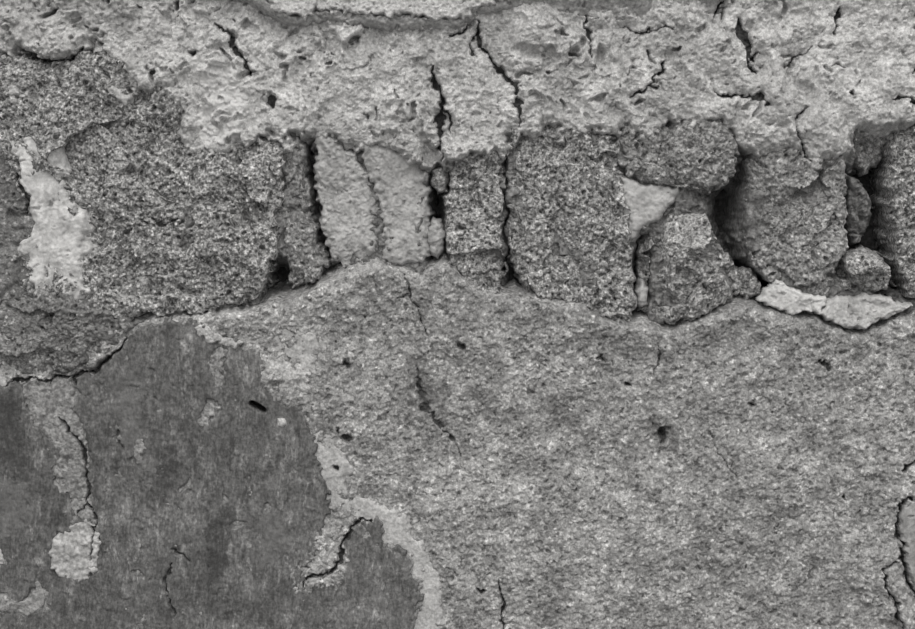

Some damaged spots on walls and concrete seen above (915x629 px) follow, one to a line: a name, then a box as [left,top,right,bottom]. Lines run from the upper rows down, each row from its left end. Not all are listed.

crack [431,68,452,151]
spalling [0,0,915,251]
crack [449,21,524,119]
crack [583,16,592,57]
crack [633,62,665,95]
crack [713,1,770,106]
crack [503,158,511,260]
spalling [277,267,290,283]
crack [11,348,121,384]
crack [64,420,98,550]
crack [303,517,372,586]
peeling [885,564,915,629]